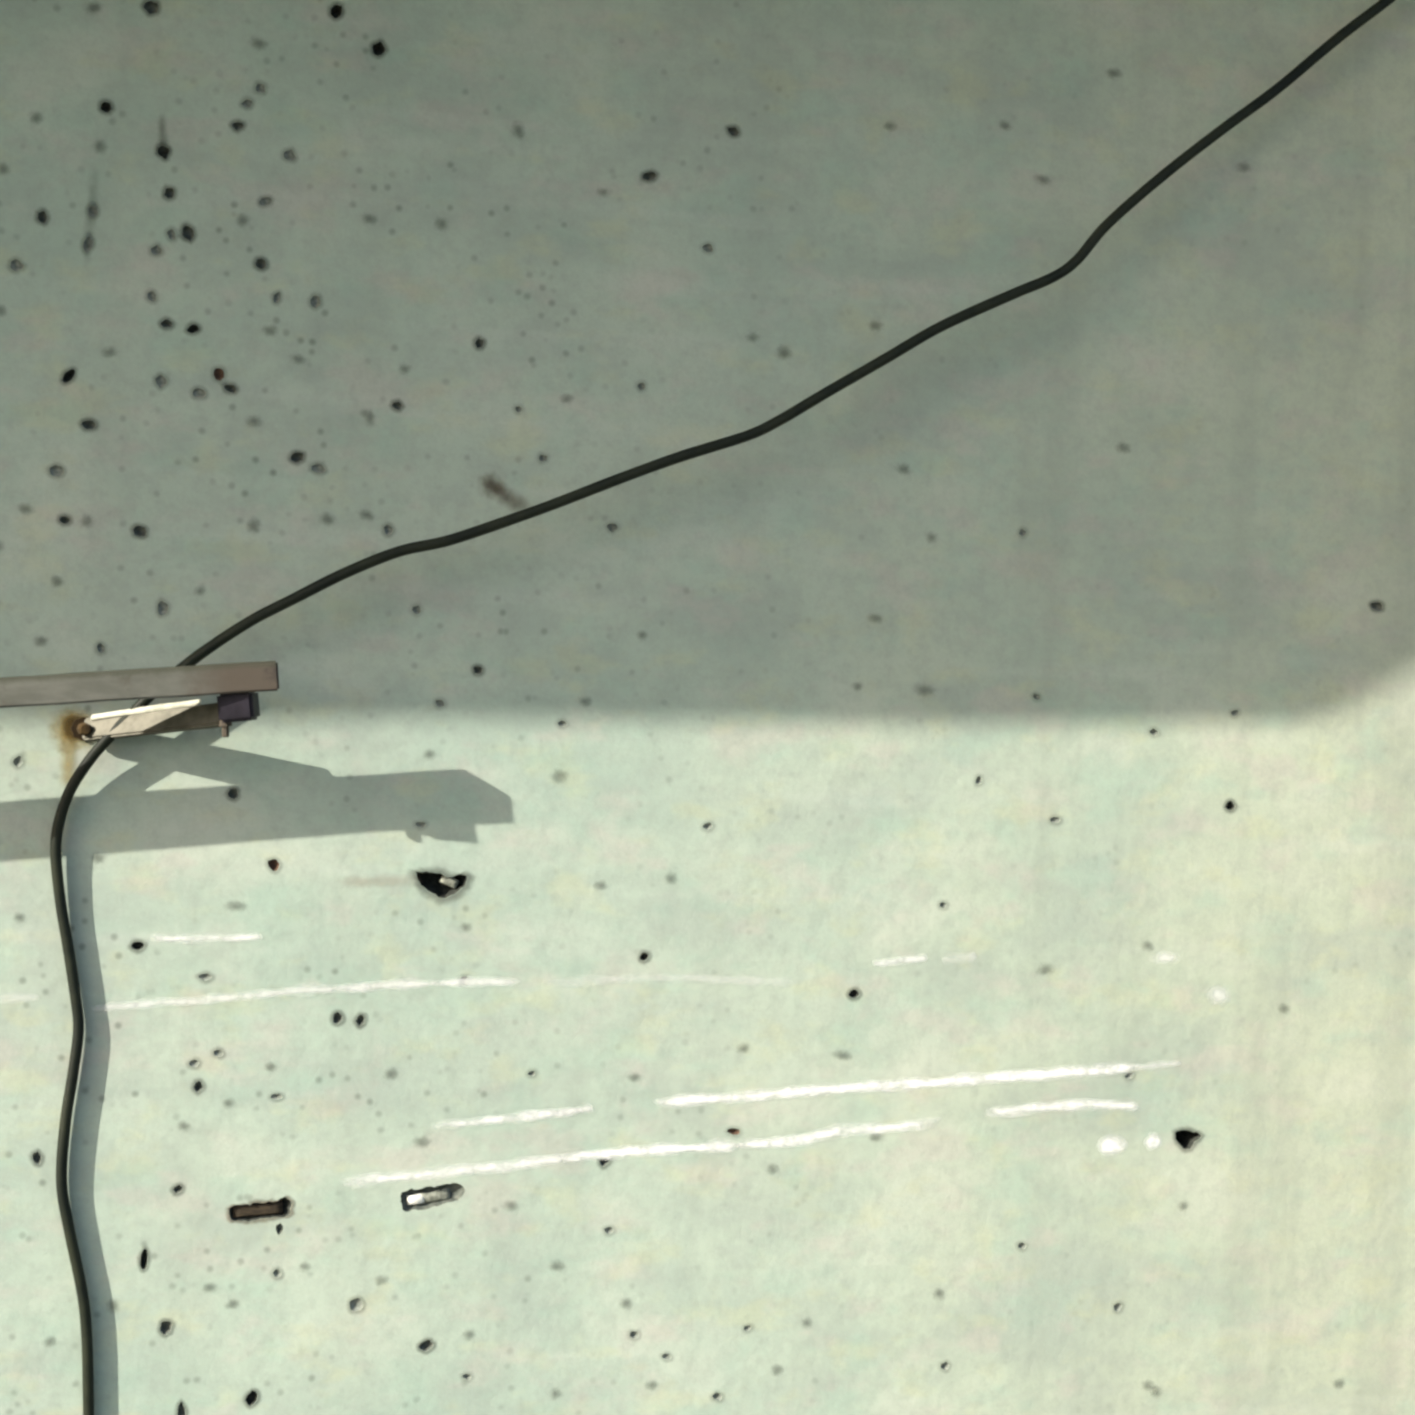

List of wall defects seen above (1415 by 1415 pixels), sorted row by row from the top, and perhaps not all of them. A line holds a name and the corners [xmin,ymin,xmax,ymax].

corrosion [58,712,84,771]
spalling [416,871,467,898]